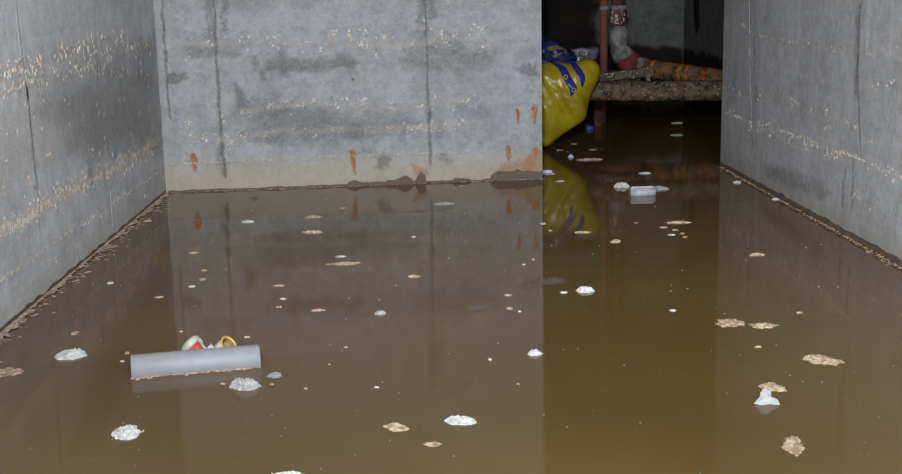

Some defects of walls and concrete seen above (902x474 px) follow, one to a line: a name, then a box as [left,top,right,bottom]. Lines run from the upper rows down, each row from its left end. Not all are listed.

damp [606,100,902,184]
damp [720,162,902,266]